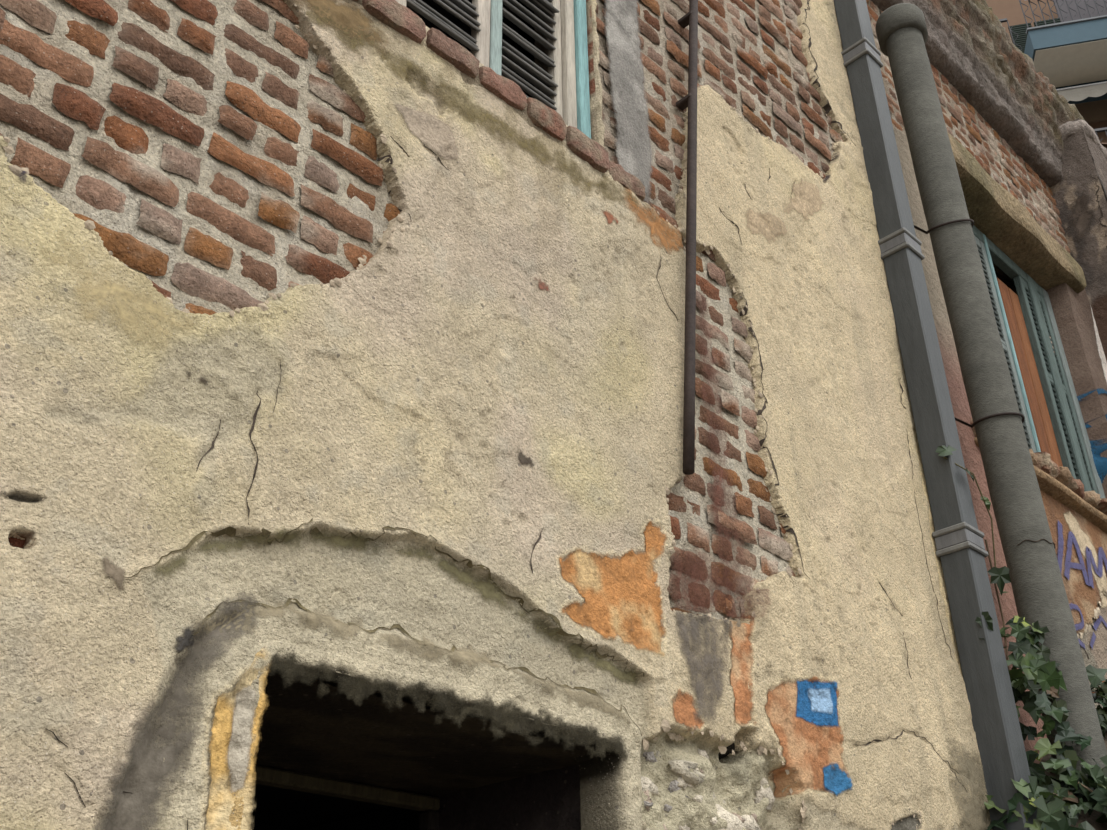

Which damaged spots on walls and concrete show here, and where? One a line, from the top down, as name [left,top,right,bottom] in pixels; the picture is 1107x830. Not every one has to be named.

spalling [0,0,405,317]
crack [1088,173,1107,248]
crack [196,419,221,472]
crack [246,363,281,524]
spalling [559,0,851,830]
peeling [1064,511,1107,639]
spalling [891,811,922,830]
crack [854,730,970,791]